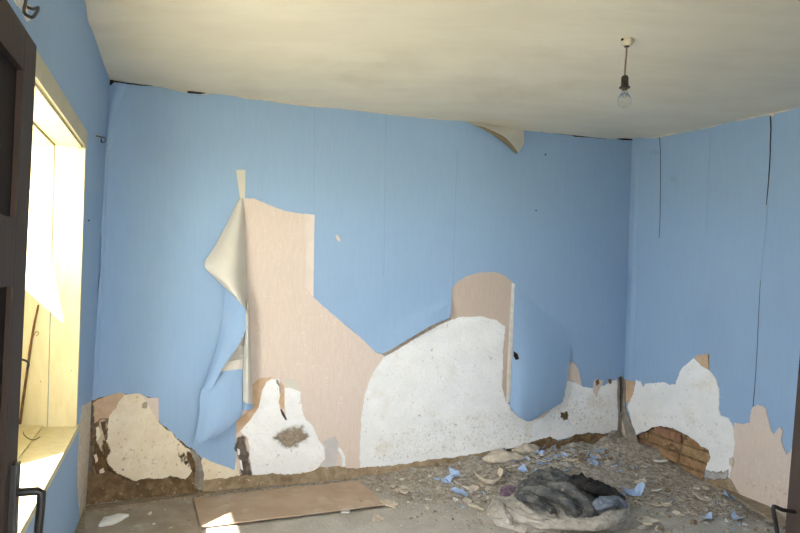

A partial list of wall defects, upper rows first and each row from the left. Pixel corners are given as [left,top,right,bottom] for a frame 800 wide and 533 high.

crack [656,137,664,236]
crack [753,116,772,407]
flaking render [86,274,740,505]